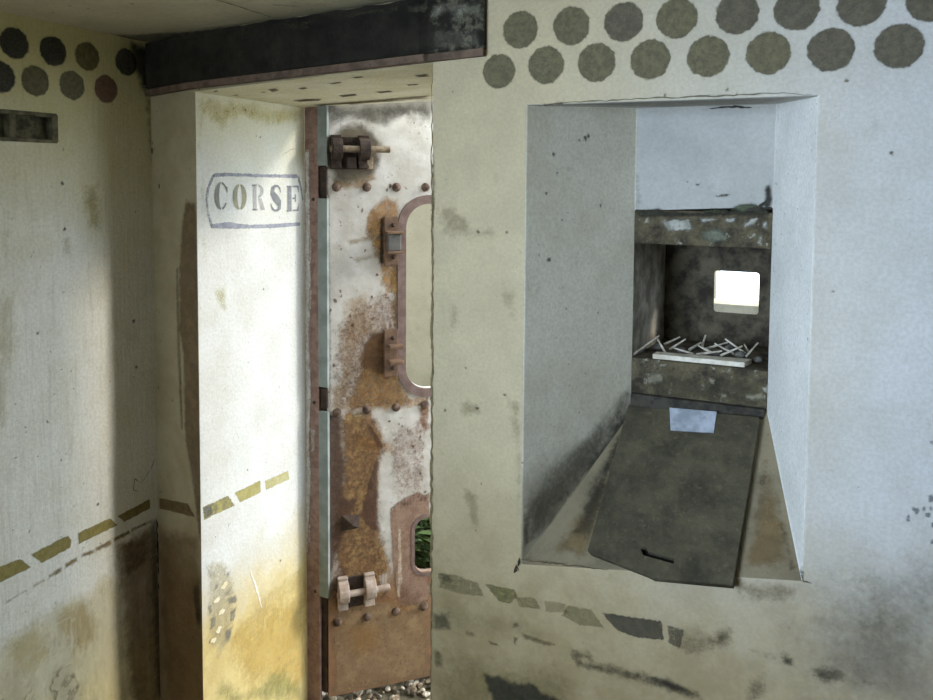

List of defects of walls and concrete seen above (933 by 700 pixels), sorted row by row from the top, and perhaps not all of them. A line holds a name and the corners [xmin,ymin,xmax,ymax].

corrosion [328,184,430,693]
damp [524,407,624,550]